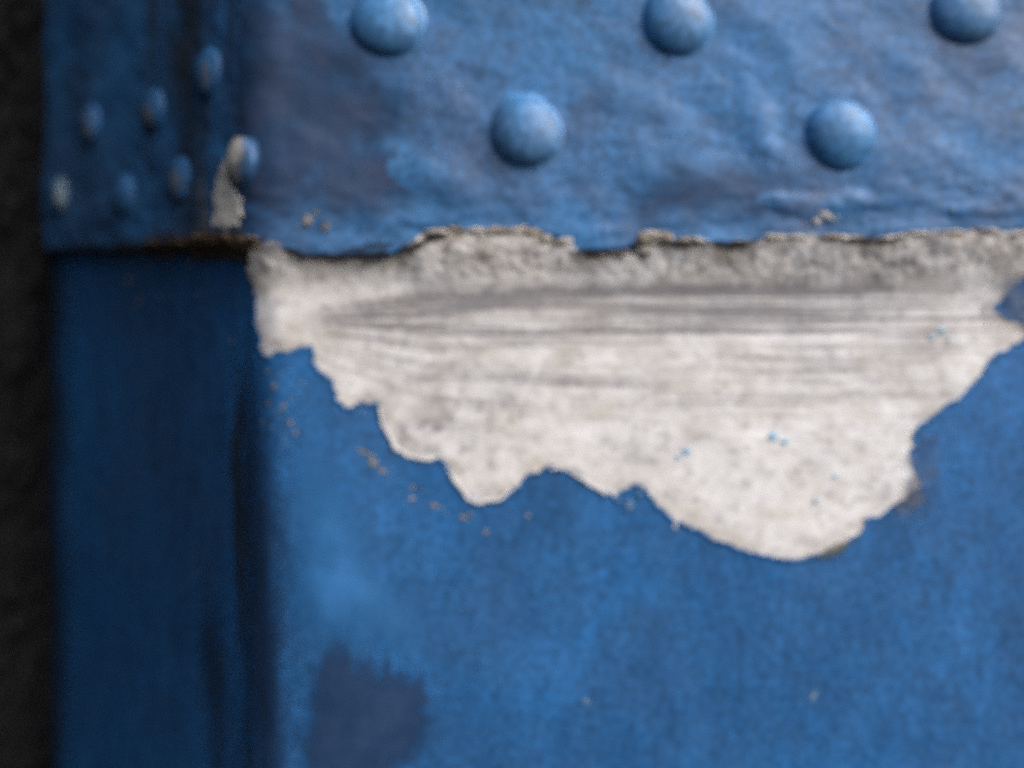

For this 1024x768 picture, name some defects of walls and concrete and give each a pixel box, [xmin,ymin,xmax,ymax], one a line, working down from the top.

peeling [212,136,244,231]
peeling [246,209,1024,565]
leakage [307,650,429,768]